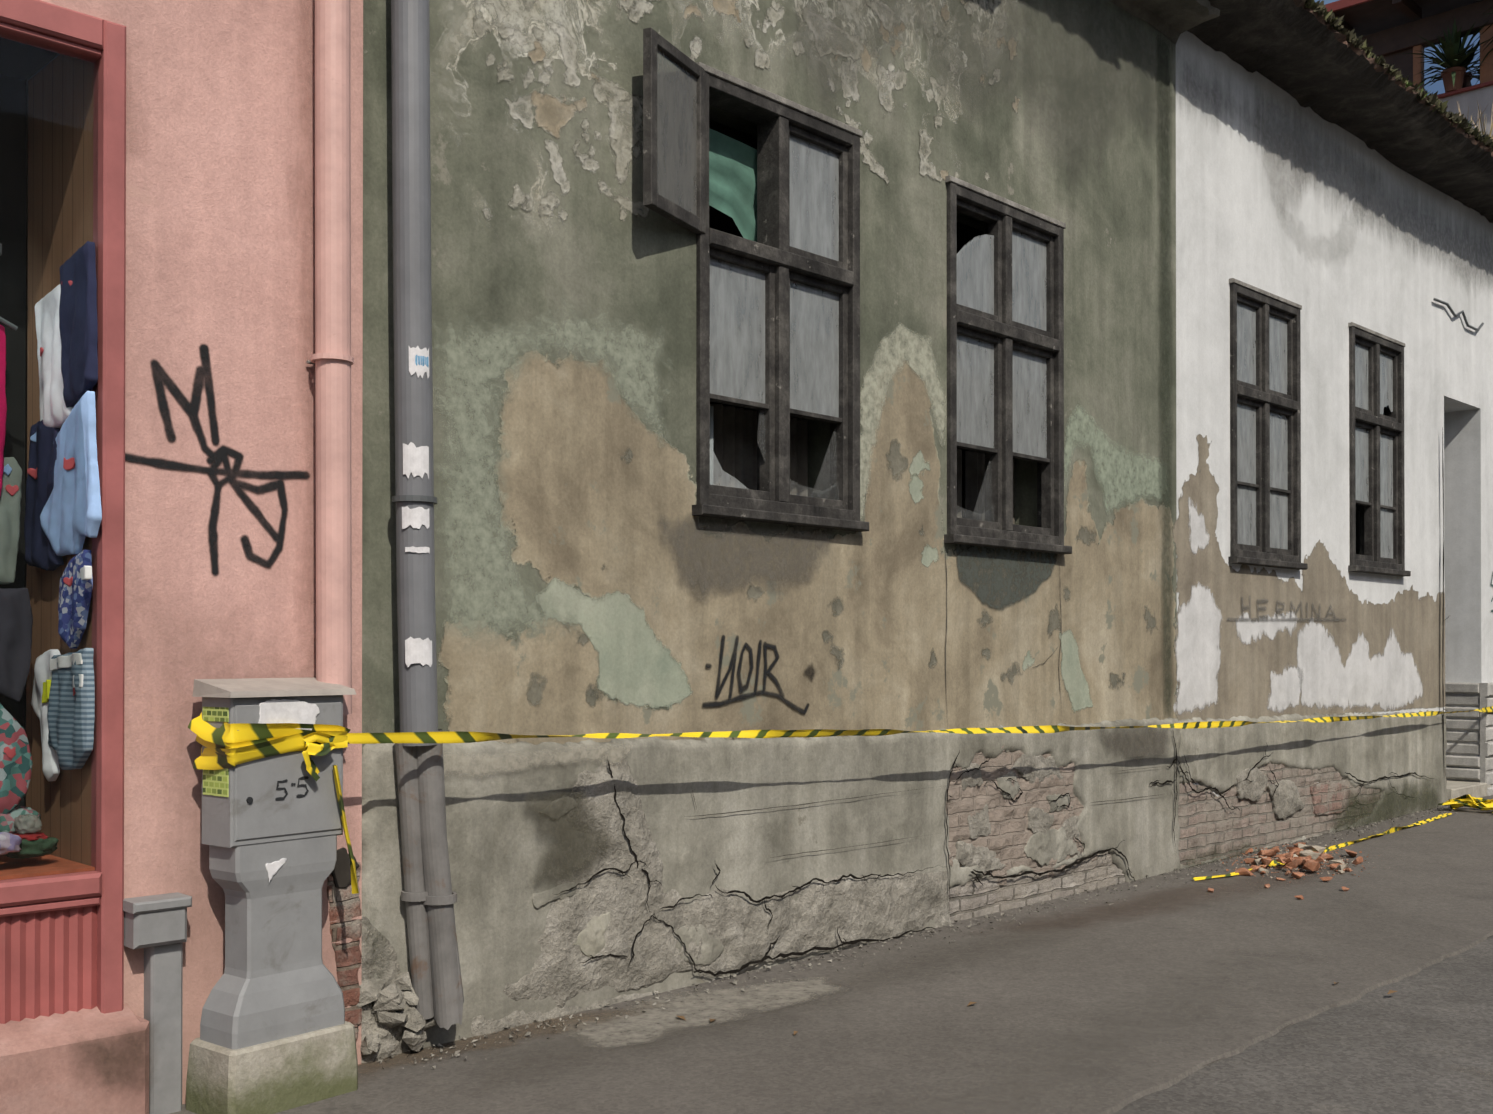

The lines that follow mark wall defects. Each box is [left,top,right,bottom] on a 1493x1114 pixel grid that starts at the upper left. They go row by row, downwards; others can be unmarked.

peeling [473,0,649,221]
peeling [617,0,660,23]
peeling [683,0,913,184]
peeling [918,62,959,182]
peeling [438,349,1446,982]
crack [554,548,1279,979]
flaking render [471,992,658,1037]